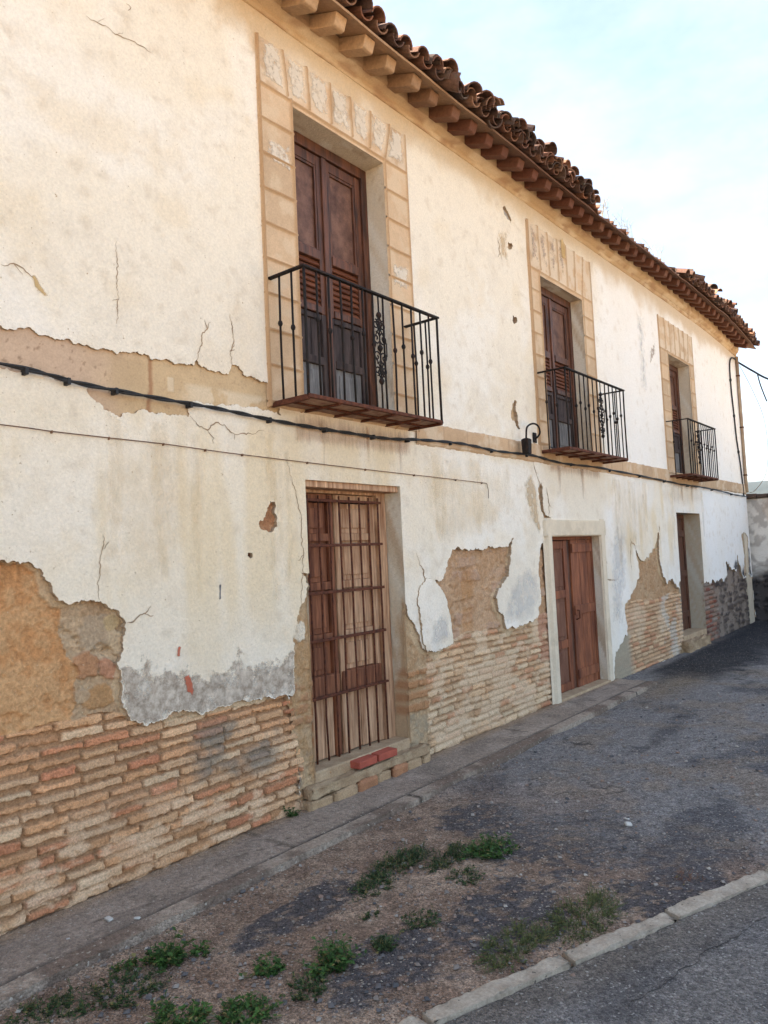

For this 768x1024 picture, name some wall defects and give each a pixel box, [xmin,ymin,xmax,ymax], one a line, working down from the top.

crack [88,8,148,51]
flaking render [0,328,278,417]
crack [198,319,235,362]
crack [190,416,262,441]
spalling [259,502,275,532]
peeling [527,479,548,530]
spalling [402,543,553,755]
spalling [614,542,691,679]
spalling [702,535,750,641]
spalling [0,560,315,936]